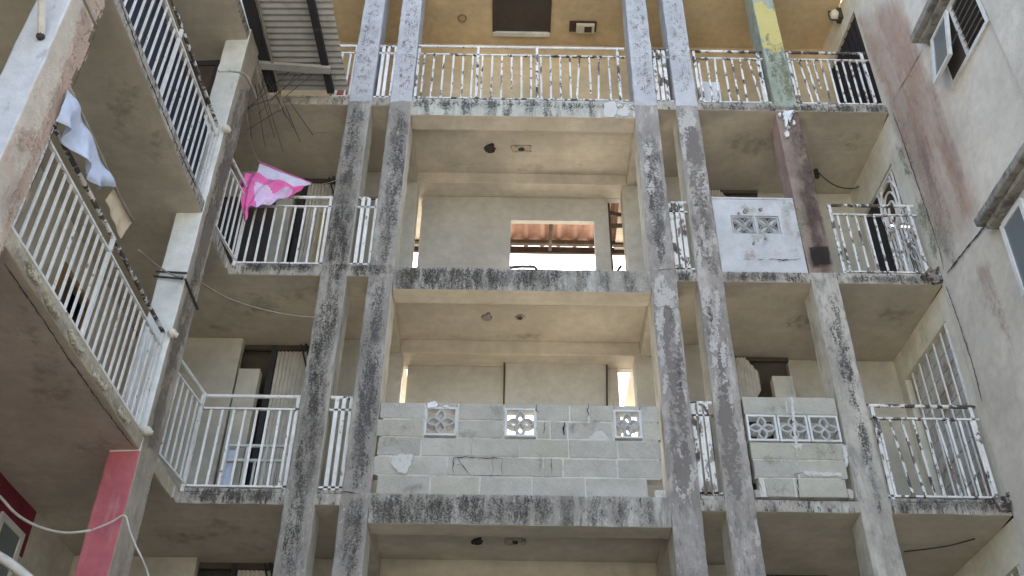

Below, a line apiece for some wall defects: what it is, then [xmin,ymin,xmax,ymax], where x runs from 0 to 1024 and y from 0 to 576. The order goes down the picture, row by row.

leakage [413,98,604,117]
leakage [705,56,851,111]
leakage [243,173,587,576]
peeling [652,272,688,417]
peeling [701,284,734,412]
leakage [827,298,859,410]
crack [452,456,503,476]